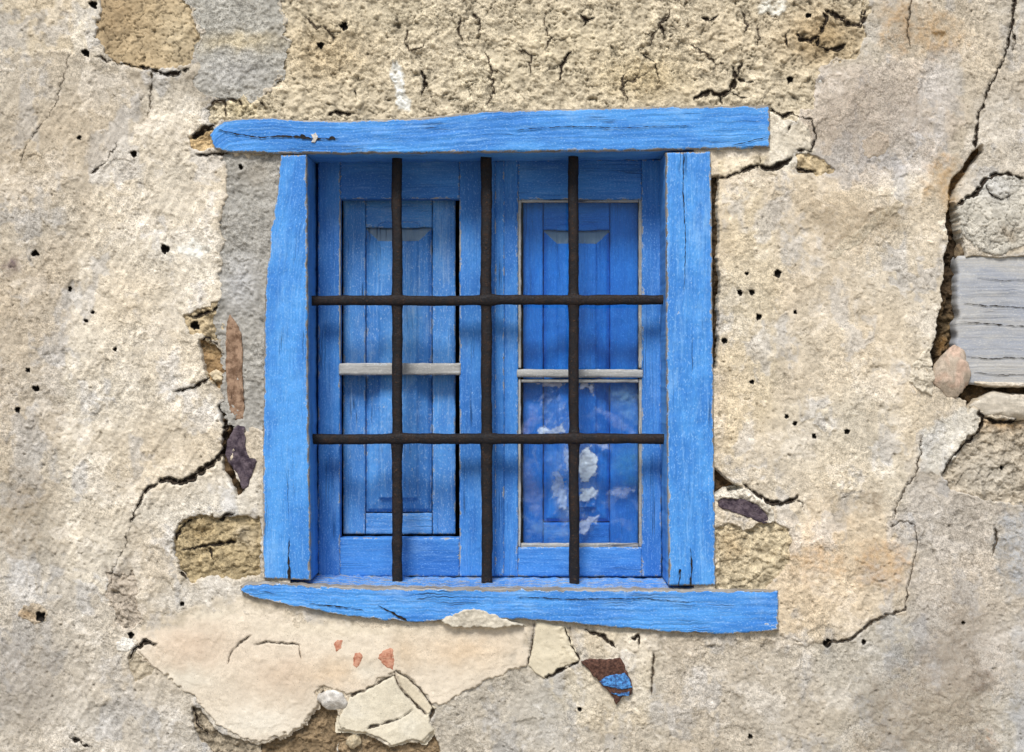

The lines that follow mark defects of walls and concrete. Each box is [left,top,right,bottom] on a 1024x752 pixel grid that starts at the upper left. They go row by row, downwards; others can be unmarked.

crack [404,30,427,96]
crack [457,14,572,104]
crack [620,8,671,102]
crack [691,5,866,179]
crack [973,0,1017,147]
peeling [950,175,1024,256]
crack [957,172,1023,205]
crack [111,420,235,582]
spalling [174,514,262,583]
spalling [714,484,792,589]
crack [828,409,1015,644]
peeling [105,570,580,752]